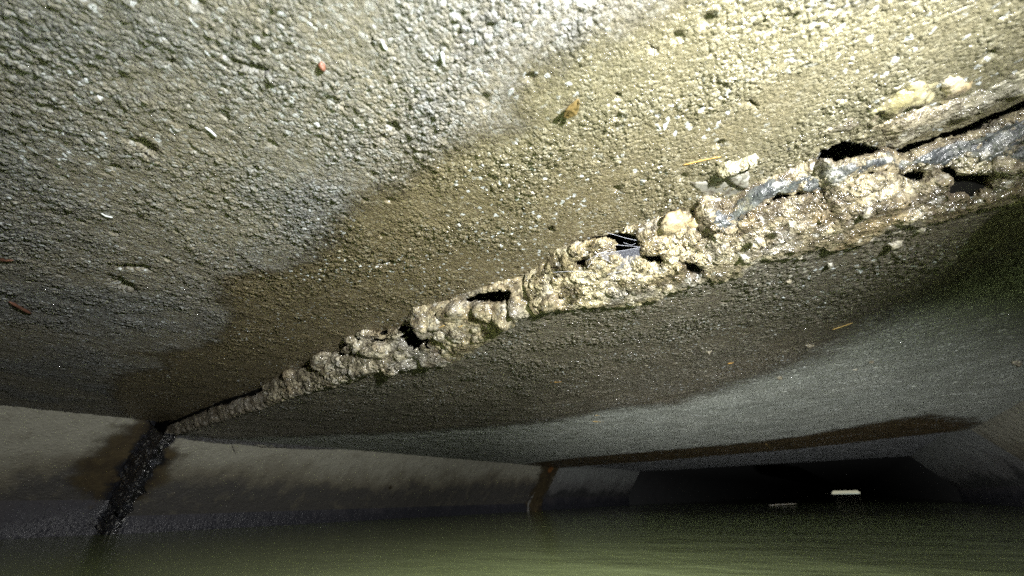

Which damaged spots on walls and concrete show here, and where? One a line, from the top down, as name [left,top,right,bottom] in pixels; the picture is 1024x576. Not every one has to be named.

peeling [690,154,759,198]
spalling [887,240,904,250]